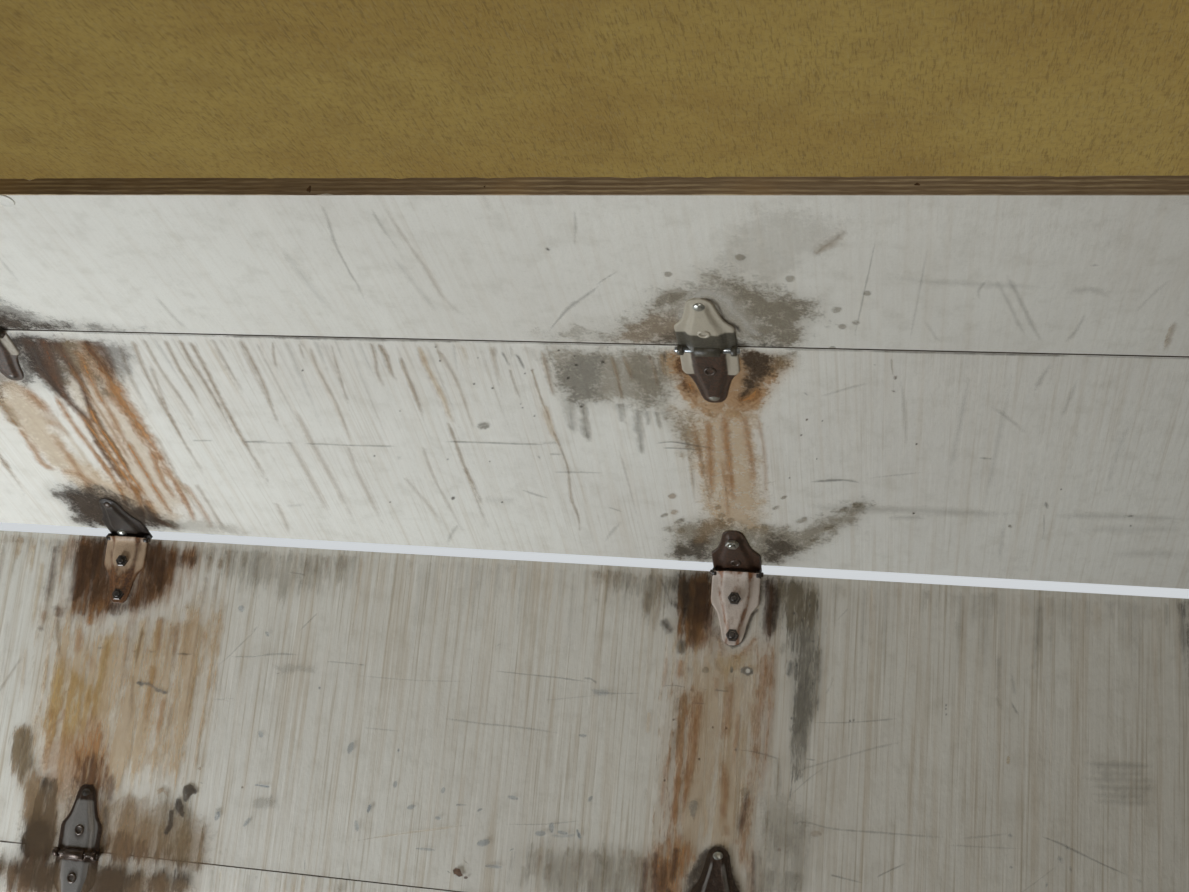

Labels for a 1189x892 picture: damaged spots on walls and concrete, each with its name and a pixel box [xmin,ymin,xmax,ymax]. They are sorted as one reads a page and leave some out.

rust [8,335,184,507]
rust [667,351,787,485]
rust [57,535,197,624]
rust [663,571,712,653]
rust [731,579,779,653]
rust [0,778,71,892]
rust [73,721,203,892]
rust [664,695,700,813]
rust [641,836,740,892]